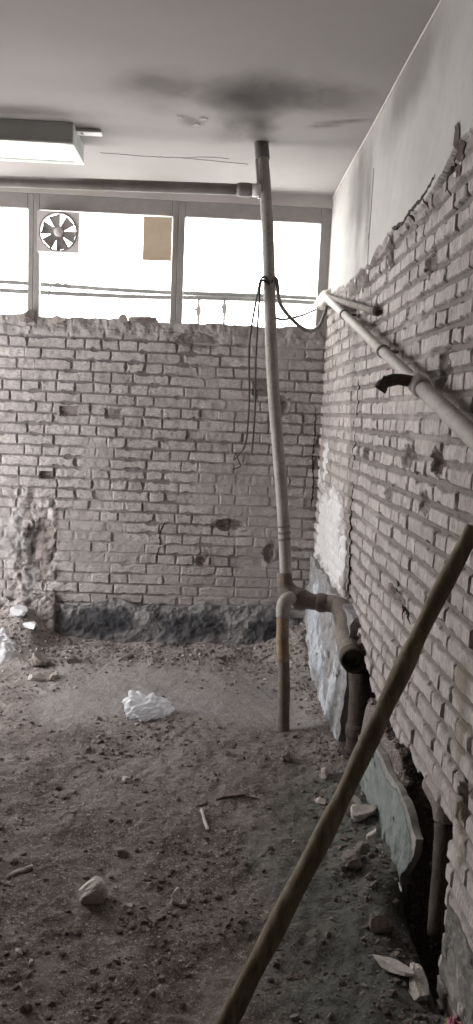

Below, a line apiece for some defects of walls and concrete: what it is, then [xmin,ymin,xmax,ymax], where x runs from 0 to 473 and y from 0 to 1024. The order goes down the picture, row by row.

spalling [453,122,466,177]
spalling [423,250,437,280]
spalling [349,268,369,300]
spalling [438,349,454,386]
spalling [401,443,417,471]
spalling [430,445,447,480]
crack [347,379,360,599]
spalling [383,480,395,502]
spalling [206,517,248,532]
spalling [21,507,56,587]